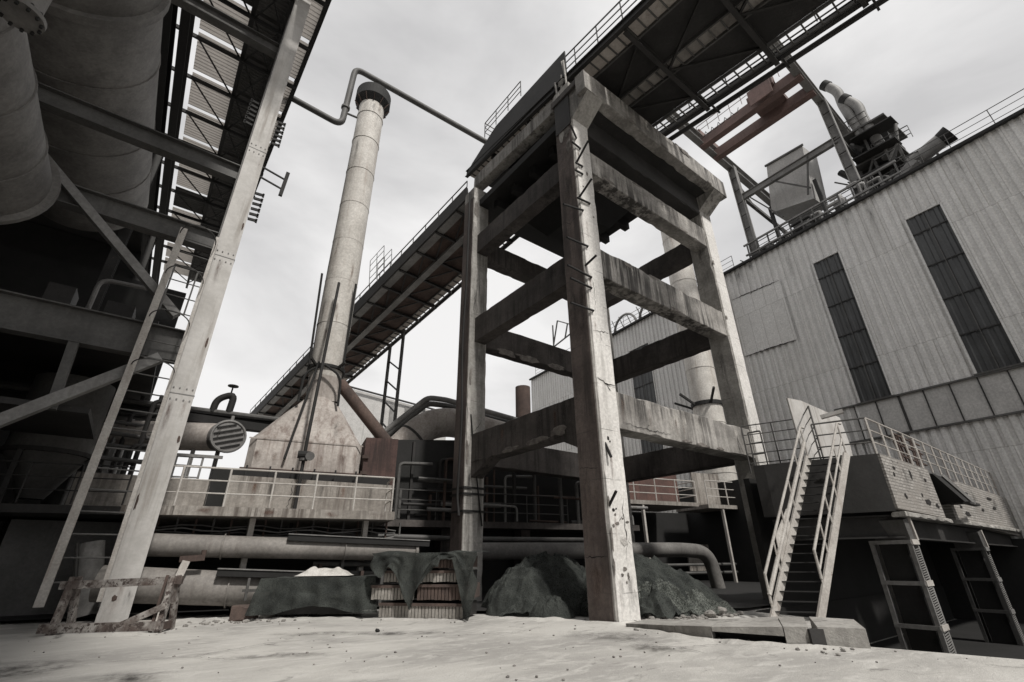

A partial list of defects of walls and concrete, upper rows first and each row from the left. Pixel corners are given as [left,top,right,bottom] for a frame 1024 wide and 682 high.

spalling [608,496,630,584]